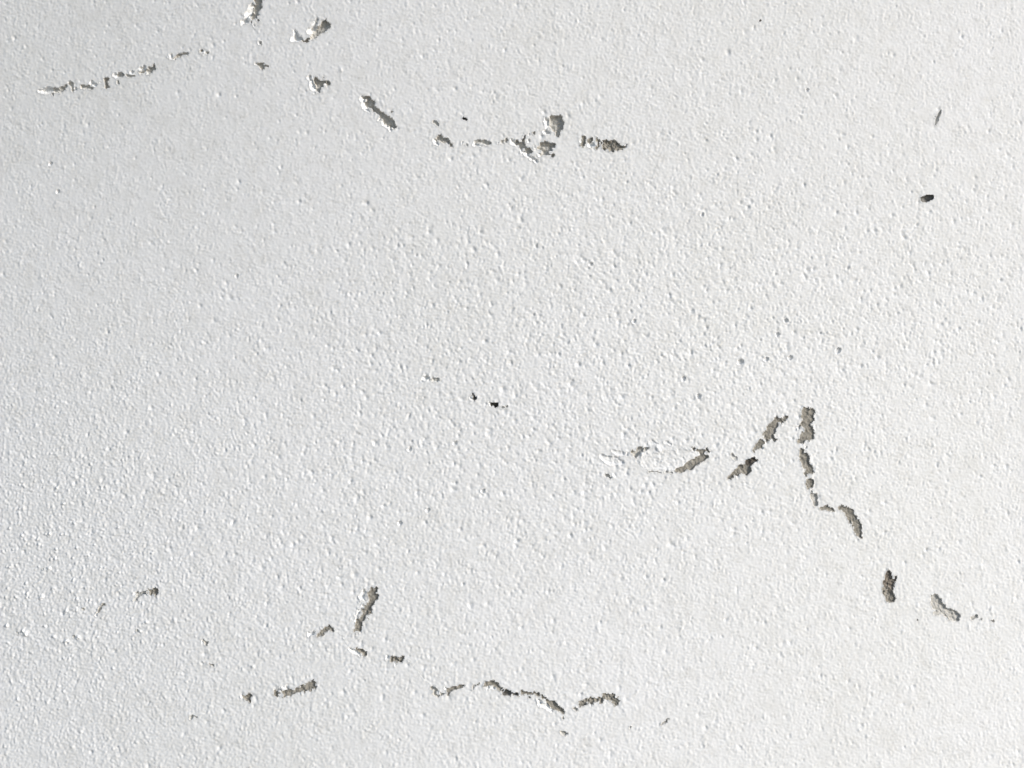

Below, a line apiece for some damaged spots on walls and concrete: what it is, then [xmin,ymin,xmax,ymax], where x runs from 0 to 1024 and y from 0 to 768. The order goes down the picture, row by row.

crack [37,49,211,97]
crack [431,113,629,165]
crack [726,406,864,540]
crack [306,624,621,715]